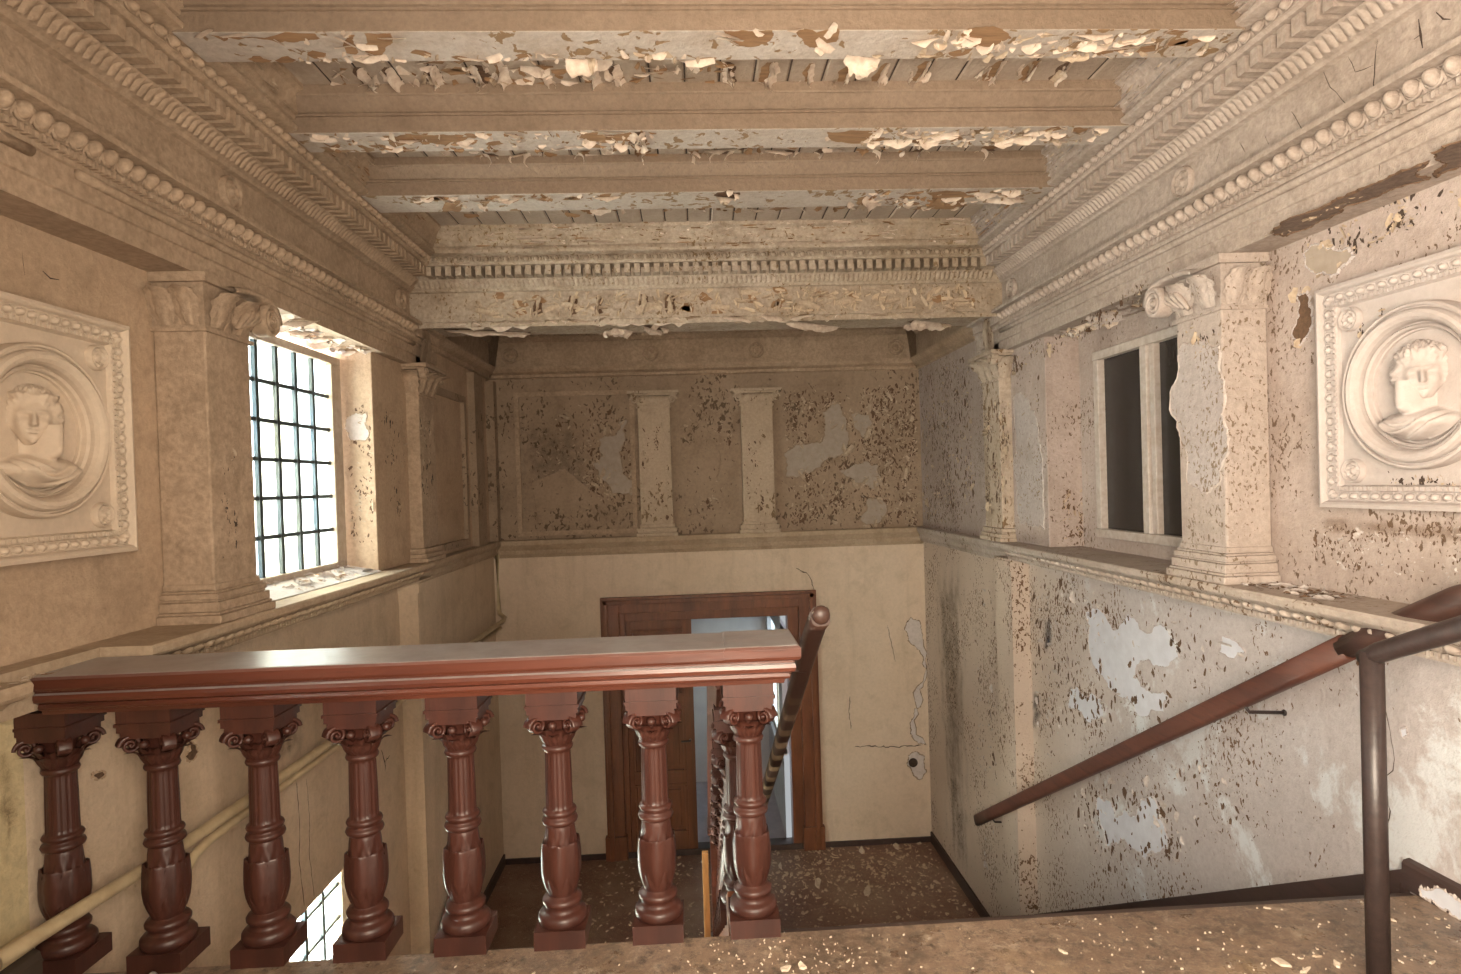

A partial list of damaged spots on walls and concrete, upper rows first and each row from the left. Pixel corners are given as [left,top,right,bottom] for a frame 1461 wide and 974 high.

peeling [194,22,891,113]
peeling [309,130,658,181]
peeling [682,126,1109,176]
peeling [404,188,1027,250]
spalling [783,281,1148,528]
peeling [1062,489,1083,539]
spalling [904,617,927,780]
spalling [1029,576,1247,758]
spalling [1073,757,1323,874]
spalling [1418,885,1461,920]